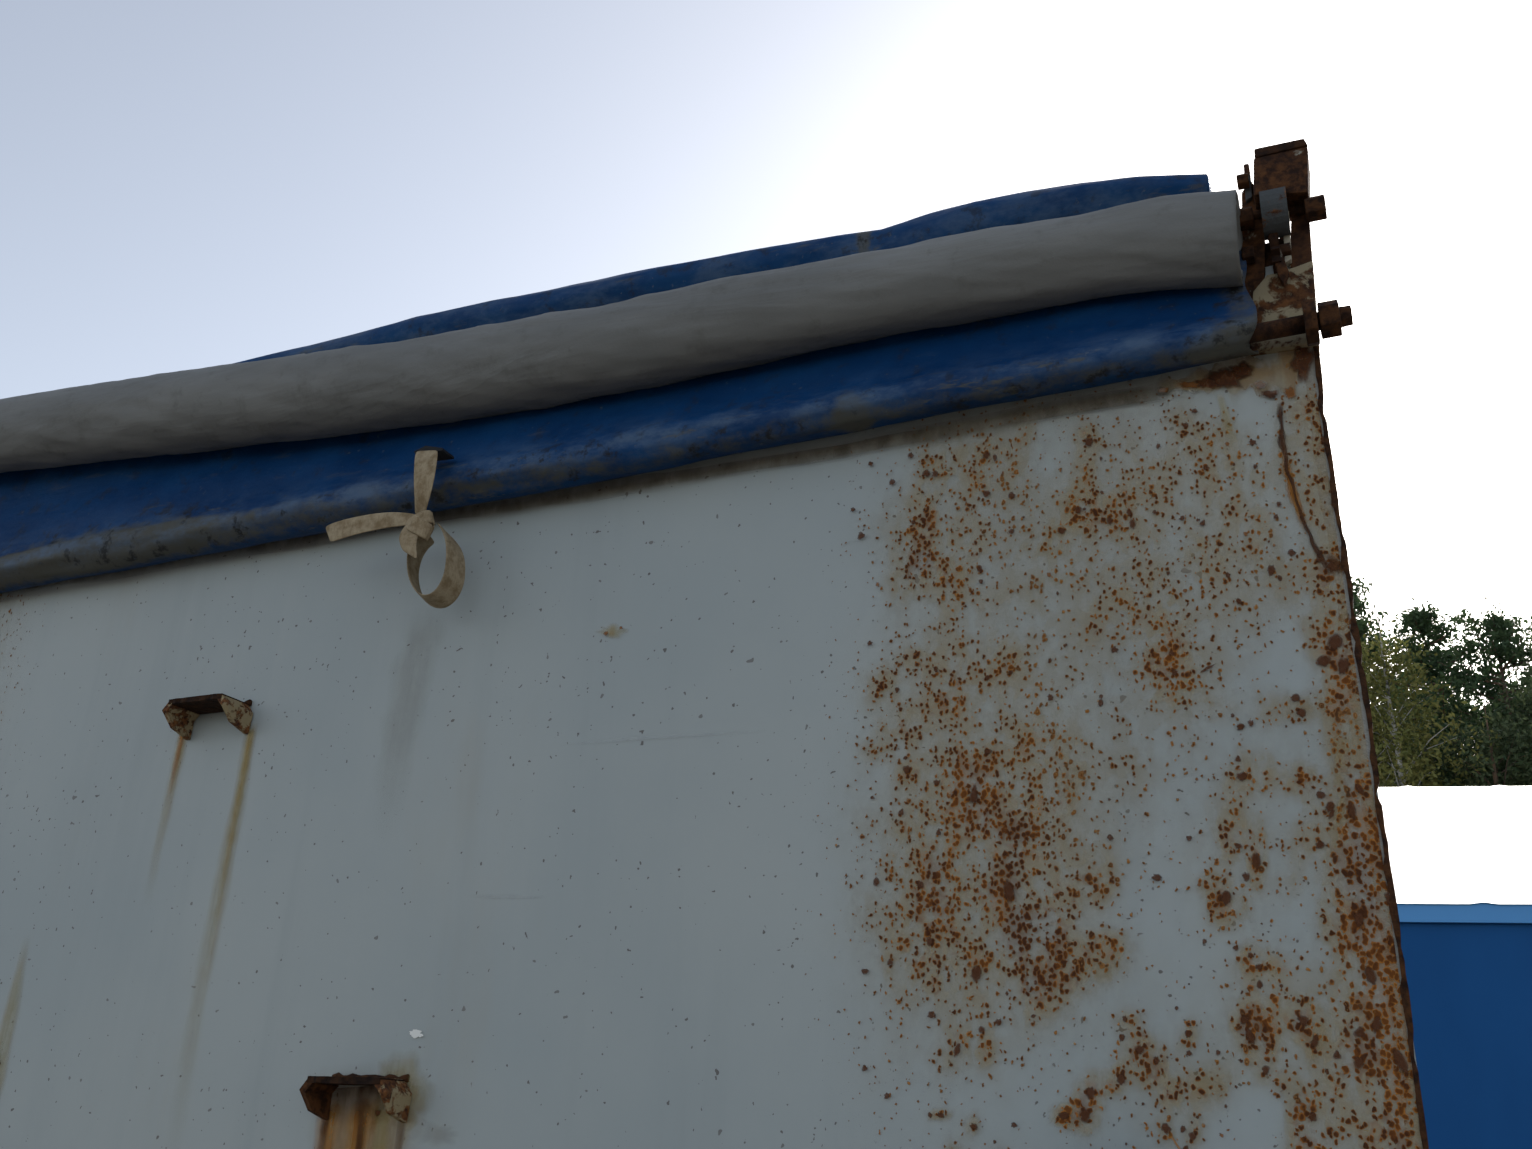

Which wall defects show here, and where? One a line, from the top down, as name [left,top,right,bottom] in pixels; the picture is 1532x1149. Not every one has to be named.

corrosion [321,1086,392,1149]